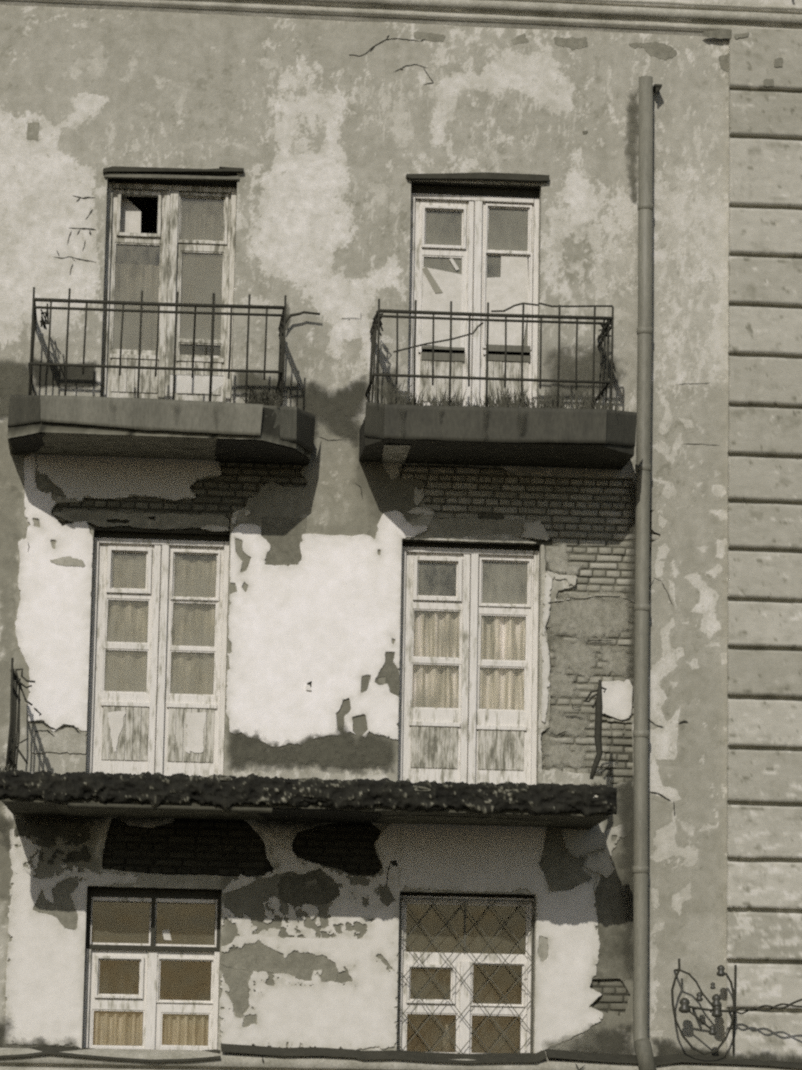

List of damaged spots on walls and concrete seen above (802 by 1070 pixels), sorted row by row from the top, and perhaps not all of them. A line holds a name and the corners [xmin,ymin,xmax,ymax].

crack [350,35,433,85]
flaking render [629,41,677,60]
flaking render [719,53,729,71]
peeling [0,76,126,363]
peeling [130,29,638,393]
peeling [652,107,729,392]
peeling [0,416,8,461]
peeling [0,454,635,1053]
peeling [648,394,728,1043]